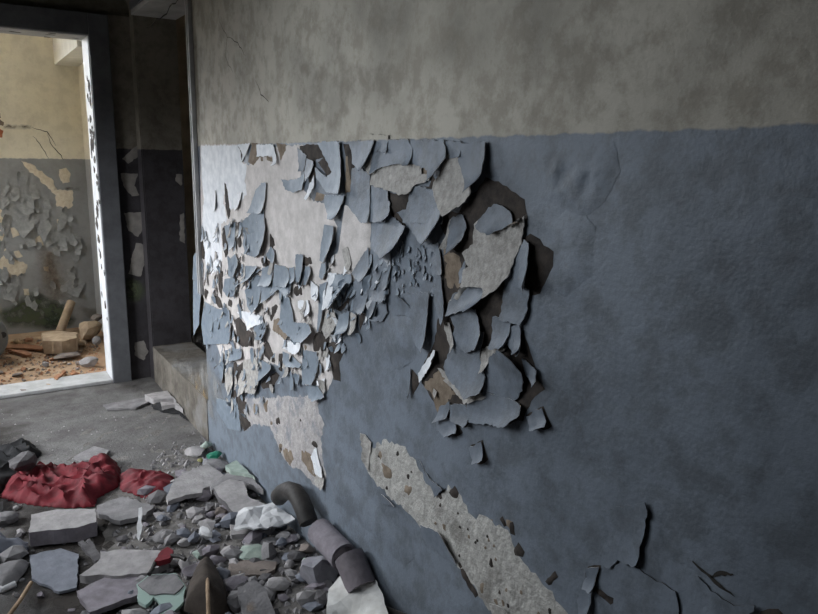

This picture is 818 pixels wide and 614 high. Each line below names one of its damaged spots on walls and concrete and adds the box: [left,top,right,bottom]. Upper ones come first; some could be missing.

peeling [0,161,85,311]
peeling [121,146,139,196]
peeling [124,212,144,276]
peeling [192,133,554,490]
spalling [360,433,568,614]
peeling [577,502,783,614]